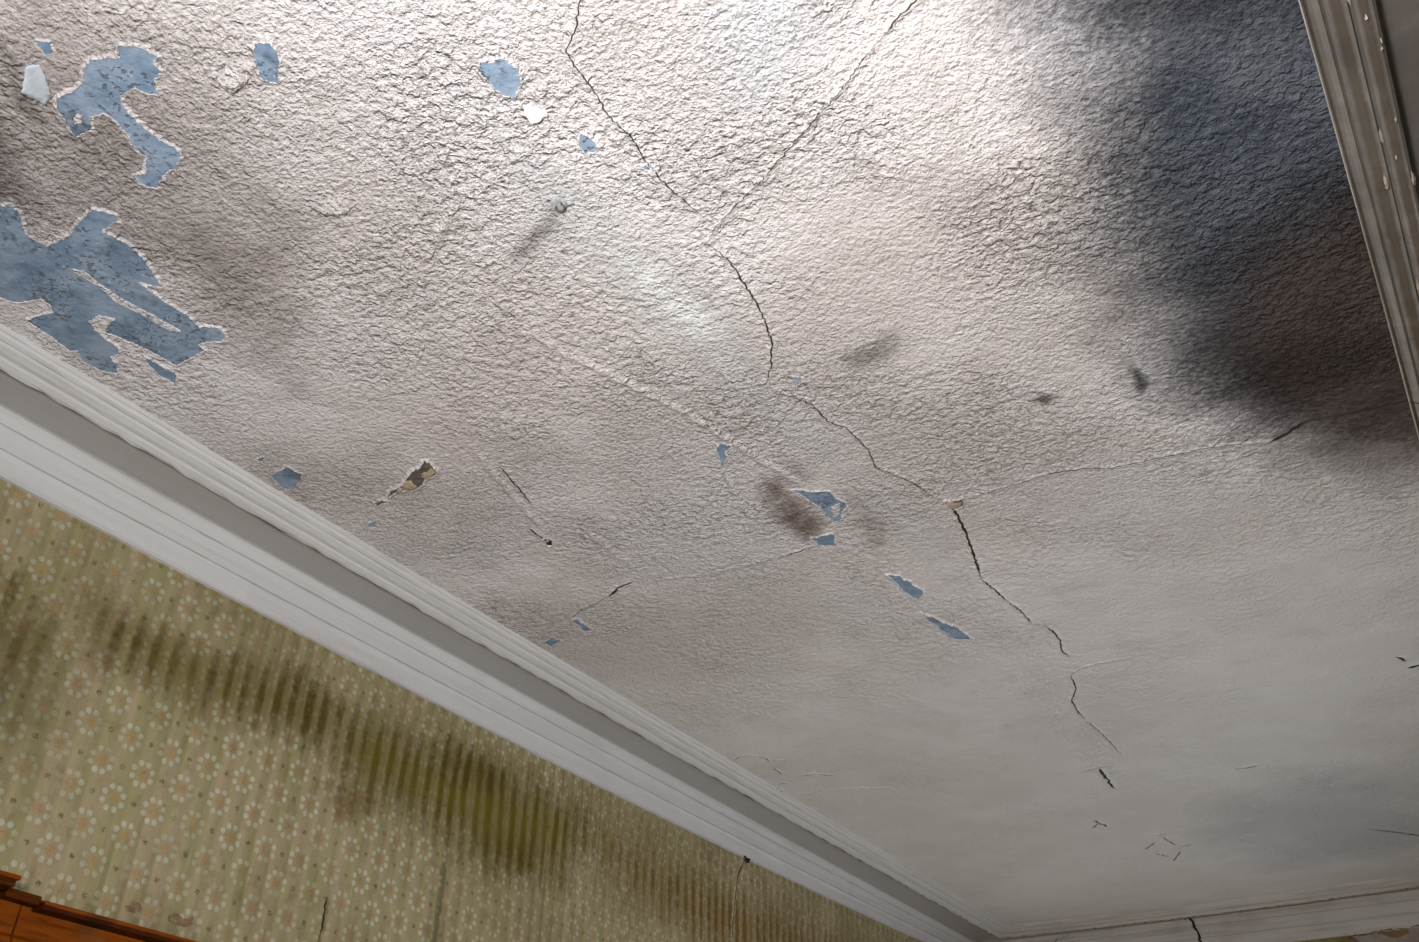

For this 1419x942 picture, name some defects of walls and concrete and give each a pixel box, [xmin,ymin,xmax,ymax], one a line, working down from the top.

peeling [21,38,184,191]
peeling [216,38,284,94]
peeling [475,54,548,125]
water stain [1038,0,1419,460]
peeling [0,201,230,385]
crack [561,0,1419,828]
flaking render [366,458,440,528]
crack [495,465,549,543]
peeling [789,487,849,547]
peeling [884,573,975,641]
water stain [109,623,584,874]
crack [1184,918,1202,942]